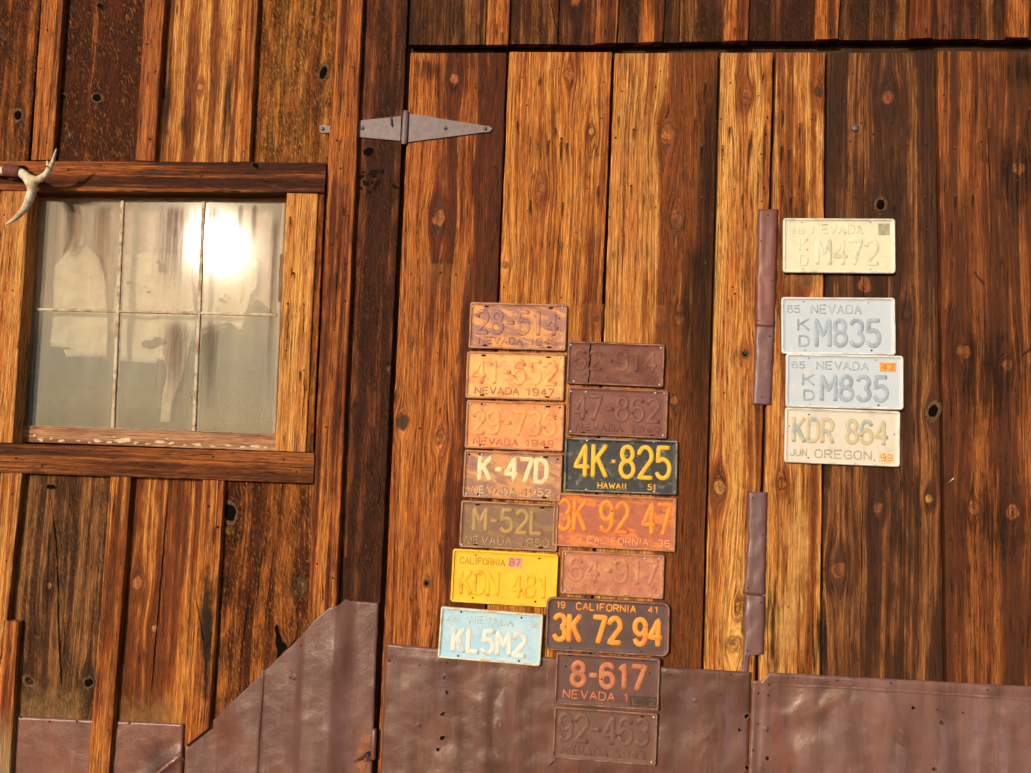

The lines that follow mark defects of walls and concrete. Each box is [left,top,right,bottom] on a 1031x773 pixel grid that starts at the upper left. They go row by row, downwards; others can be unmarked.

peeling [33,434,267,449]
crack [46,490,65,713]